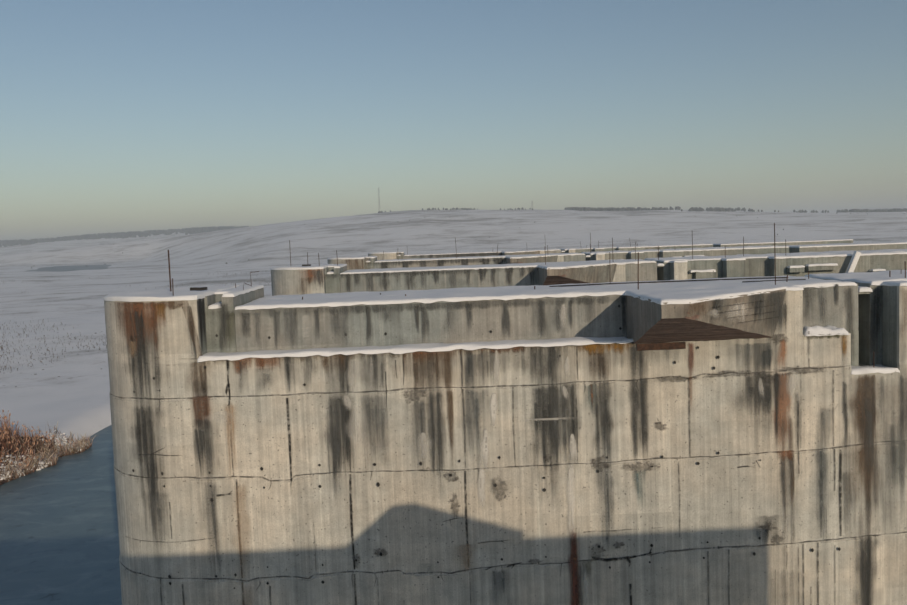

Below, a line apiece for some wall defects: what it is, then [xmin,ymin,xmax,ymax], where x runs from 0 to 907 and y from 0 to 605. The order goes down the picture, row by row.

water stain [130,312,157,382]
water stain [332,305,386,339]
water stain [400,301,488,333]
water stain [503,300,529,332]
water stain [136,409,157,491]
water stain [330,355,352,473]
water stain [422,376,453,459]
water stain [535,386,577,462]
water stain [632,348,647,451]
corrosion [775,374,790,438]
corrosion [571,533,579,605]